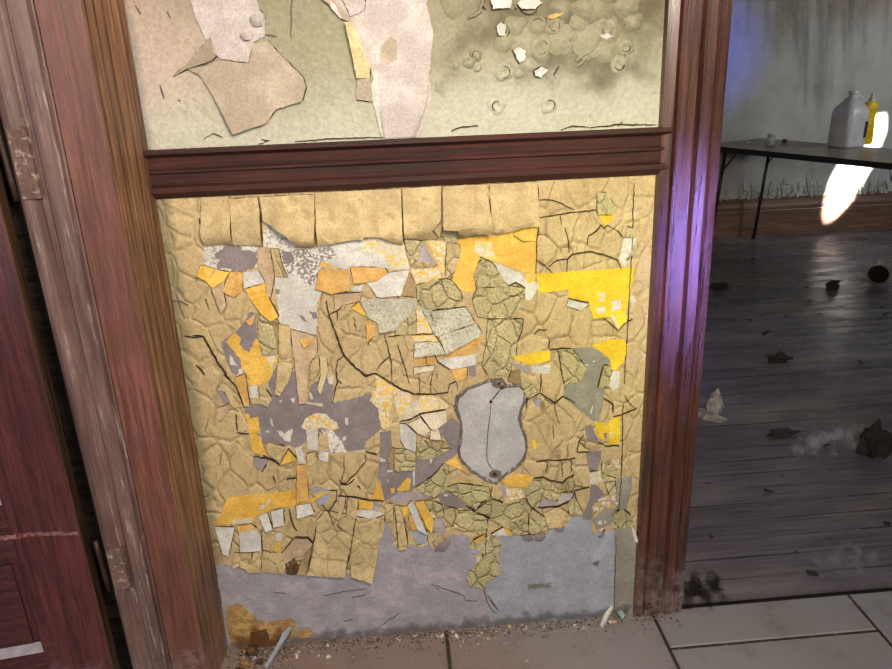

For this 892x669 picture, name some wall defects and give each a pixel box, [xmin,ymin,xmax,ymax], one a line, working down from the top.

peeling [173,0,307,135]
peeling [324,0,433,139]
peeling [720,172,892,201]
crack [326,301,458,433]
peeling [196,181,639,661]
crack [482,282,575,438]
crack [526,185,637,529]
crack [455,489,504,556]